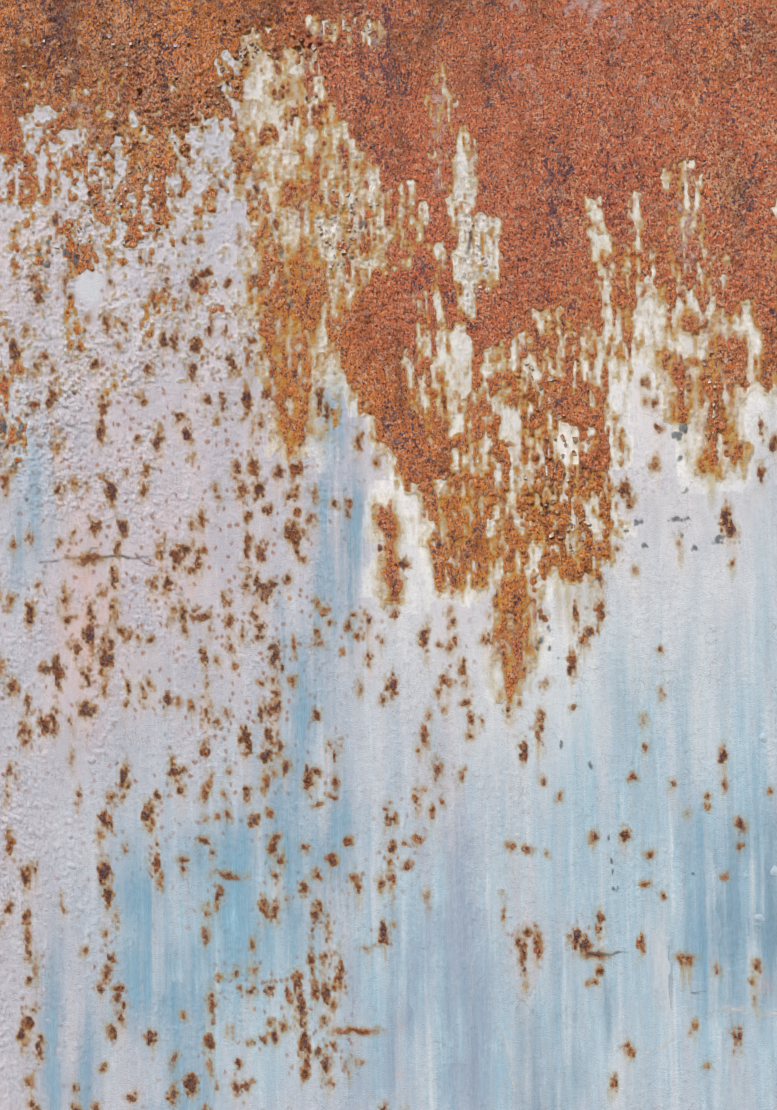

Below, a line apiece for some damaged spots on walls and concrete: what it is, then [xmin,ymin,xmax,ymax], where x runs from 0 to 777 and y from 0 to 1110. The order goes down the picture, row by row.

peeling [102,7,190,66]
peeling [181,31,316,127]
peeling [37,154,169,267]
peeling [0,416,24,450]
rust [0,0,777,827]
peeling [544,434,578,481]
peeling [672,424,687,440]
rust [97,862,117,918]
rust [141,789,164,889]
rust [378,802,423,893]
rust [165,834,372,1104]
rust [567,911,605,985]